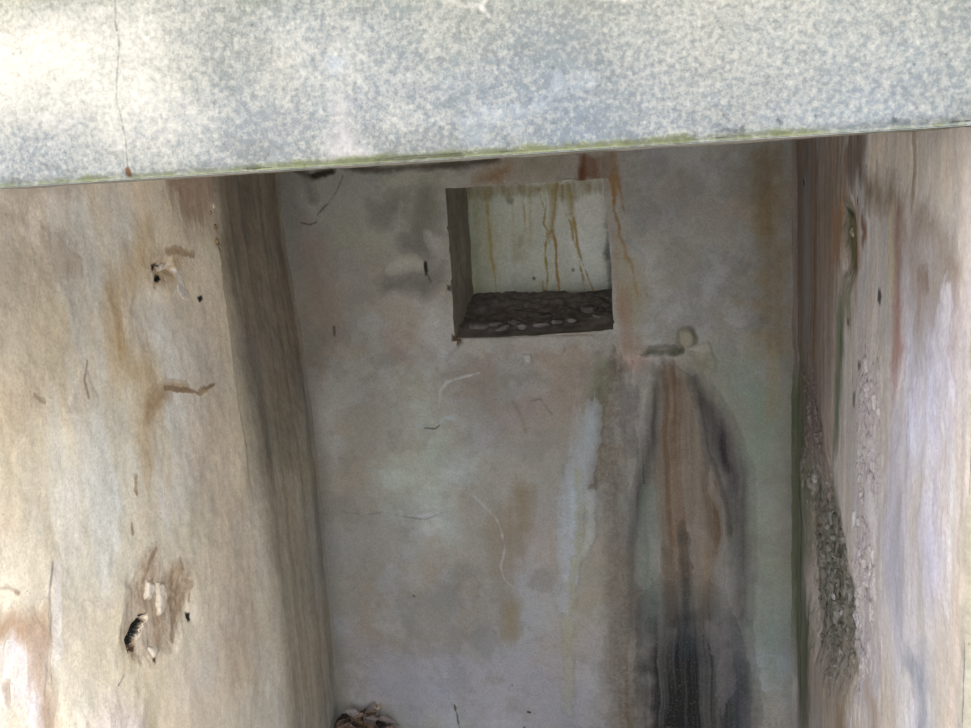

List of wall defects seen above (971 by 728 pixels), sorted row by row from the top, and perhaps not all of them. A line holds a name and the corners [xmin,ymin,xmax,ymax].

crack [444,0,492,19]
crack [561,0,653,8]
crack [114,0,132,176]
peeling [151,262,171,283]
corrosion [466,150,654,373]
spalling [800,195,888,728]
spalling [117,541,195,669]
crack [472,495,515,589]
water stain [444,334,786,728]